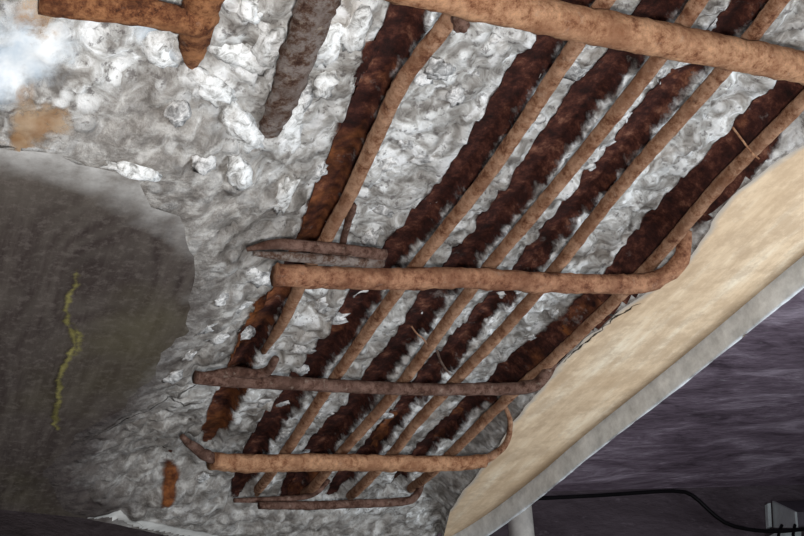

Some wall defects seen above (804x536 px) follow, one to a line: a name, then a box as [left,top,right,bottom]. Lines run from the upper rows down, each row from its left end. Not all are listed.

damp [51,273,83,430]
spalling [0,0,479,536]
rust [296,3,427,241]
spalling [317,10,536,249]
rust [382,35,565,268]
spalling [387,288,583,384]
spalling [393,41,608,268]
rust [442,48,647,268]
spalling [476,56,690,270]
rust [512,64,709,272]
spalling [537,66,777,274]
rust [604,80,804,275]